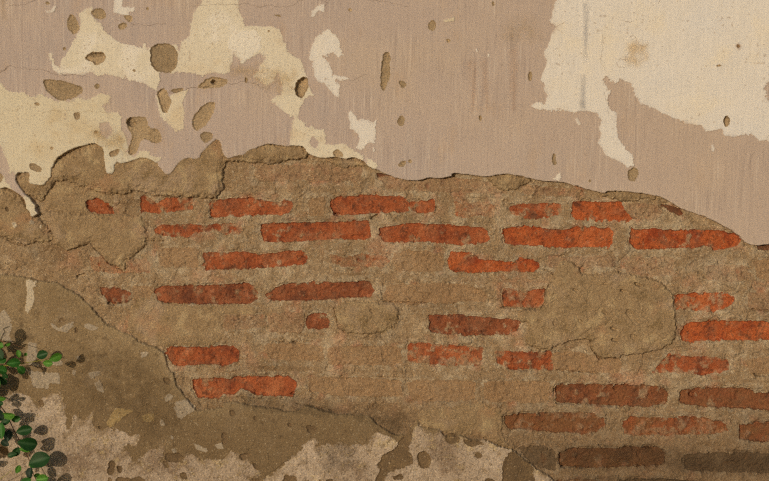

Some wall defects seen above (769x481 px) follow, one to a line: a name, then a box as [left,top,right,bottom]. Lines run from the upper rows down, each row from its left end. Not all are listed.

peeling [0,79,162,185]
peeling [49,0,364,161]
peeling [349,110,377,150]
peeling [528,0,769,181]
spalling [0,140,769,481]